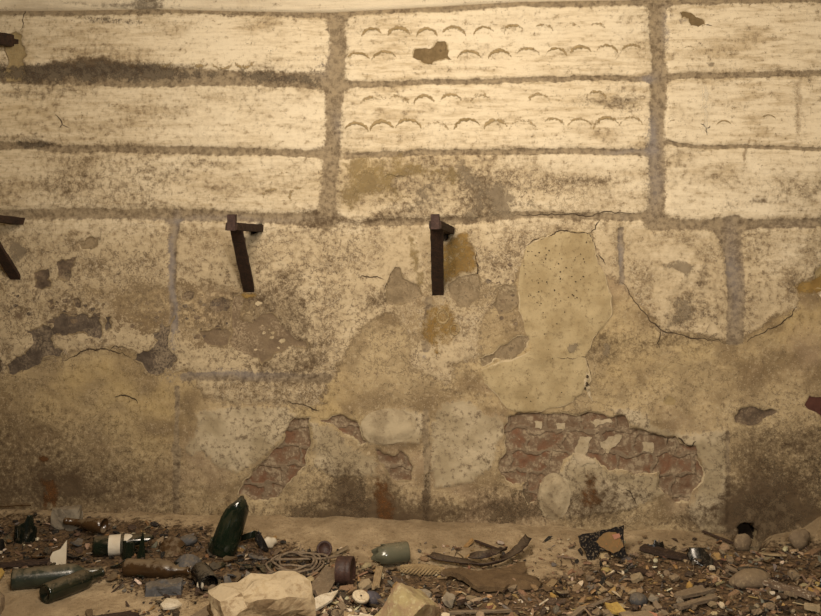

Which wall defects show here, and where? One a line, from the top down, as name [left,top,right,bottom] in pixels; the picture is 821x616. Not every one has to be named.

flaking render [412,41,452,65]
water stain [0,60,219,83]
water stain [241,69,318,87]
crack [514,211,630,263]
flaking render [0,257,112,375]
crack [621,282,727,348]
crack [747,306,797,342]
flaking render [448,230,705,505]
flaking render [735,407,779,426]
peeling [805,395,821,417]
flaking render [238,414,366,501]
flaking render [376,449,413,482]